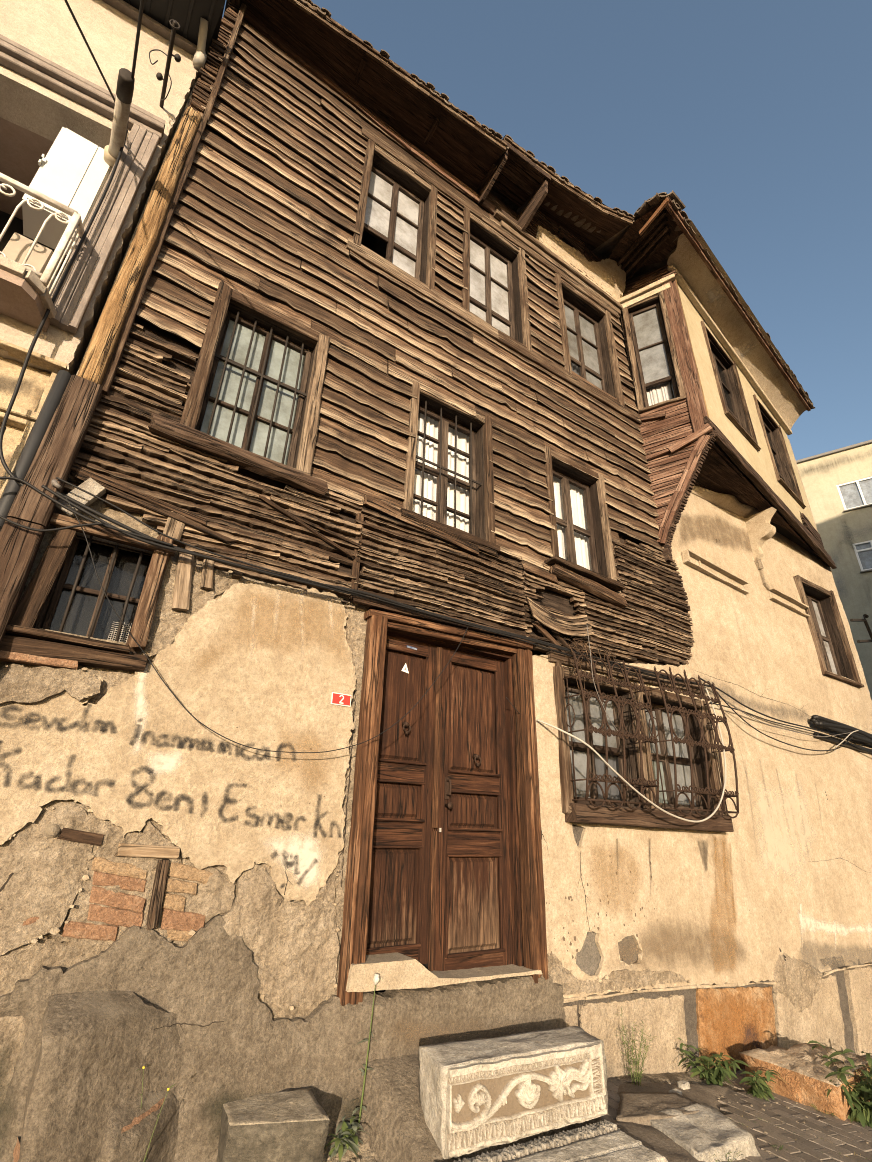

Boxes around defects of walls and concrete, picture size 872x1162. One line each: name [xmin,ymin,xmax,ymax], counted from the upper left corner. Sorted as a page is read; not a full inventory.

flaking render [143,555,240,657]
flaking render [0,650,101,704]
crack [0,873,14,910]
flaking render [0,802,340,1010]
crack [576,852,591,934]
flaking render [547,855,690,995]